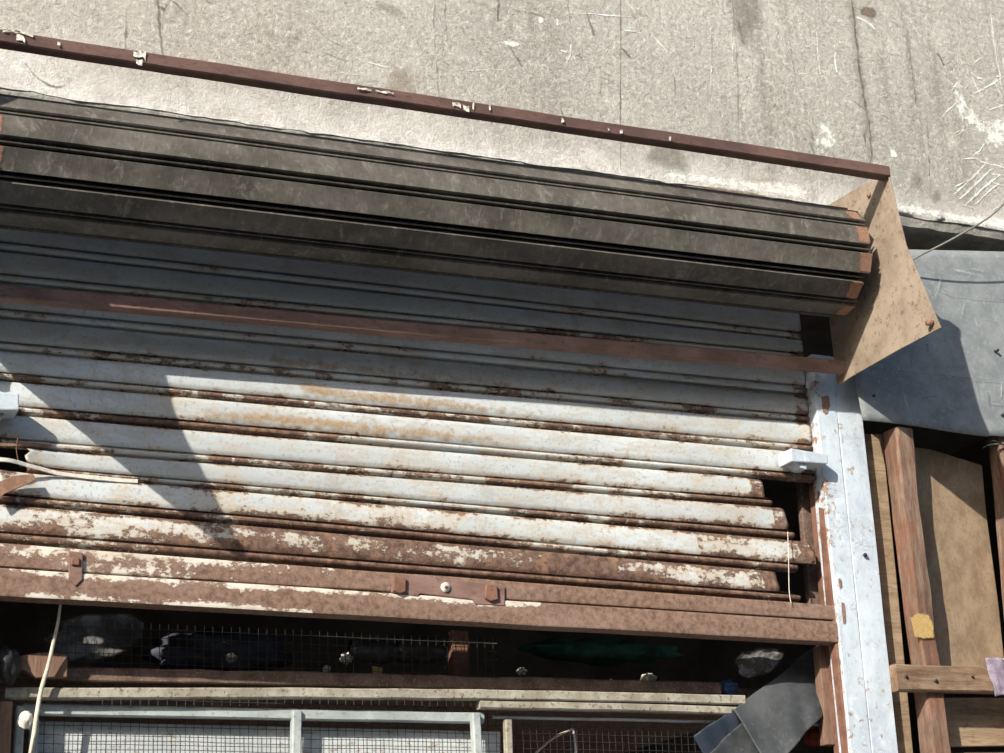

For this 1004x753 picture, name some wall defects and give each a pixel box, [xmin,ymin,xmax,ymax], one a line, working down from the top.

crack [156,0,176,37]
crack [852,5,872,159]
spalling [955,83,1004,148]
rust [214,414,453,437]